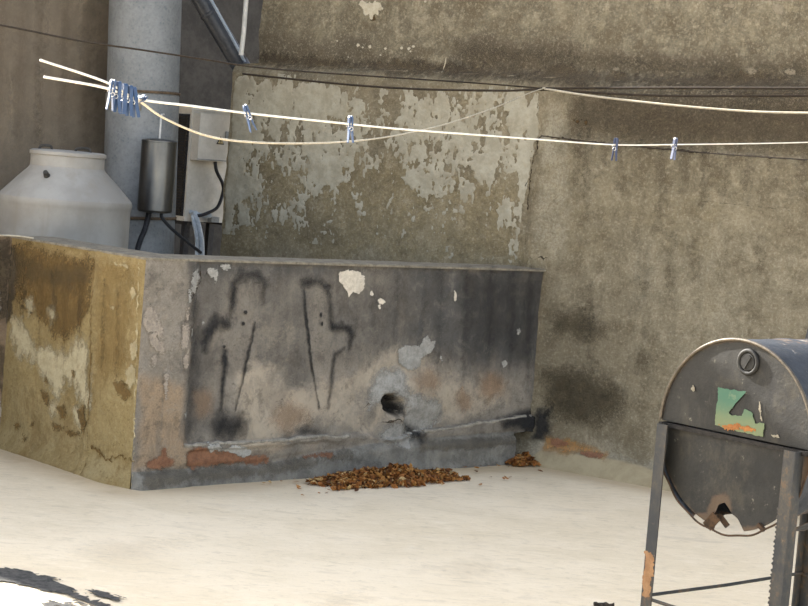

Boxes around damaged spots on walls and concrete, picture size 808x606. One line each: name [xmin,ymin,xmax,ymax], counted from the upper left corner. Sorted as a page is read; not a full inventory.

flaking render [359,0,383,21]
peeling [223,74,539,264]
flaking render [339,269,386,309]
peeling [397,336,443,370]
water stain [40,376,86,439]
water stain [503,370,623,439]